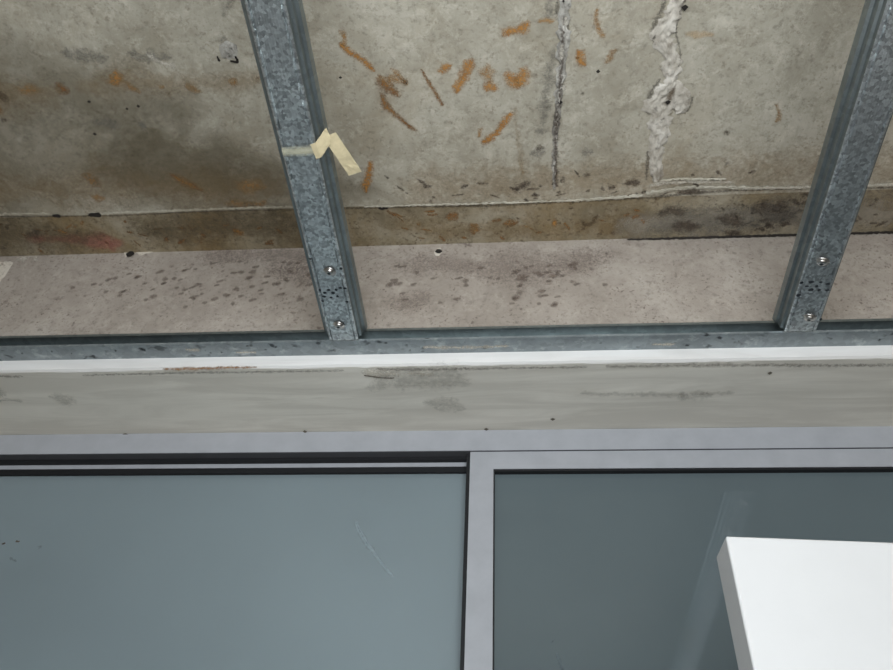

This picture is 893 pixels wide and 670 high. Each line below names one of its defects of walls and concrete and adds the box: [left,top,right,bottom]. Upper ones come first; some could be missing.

damp [616,193,808,236]